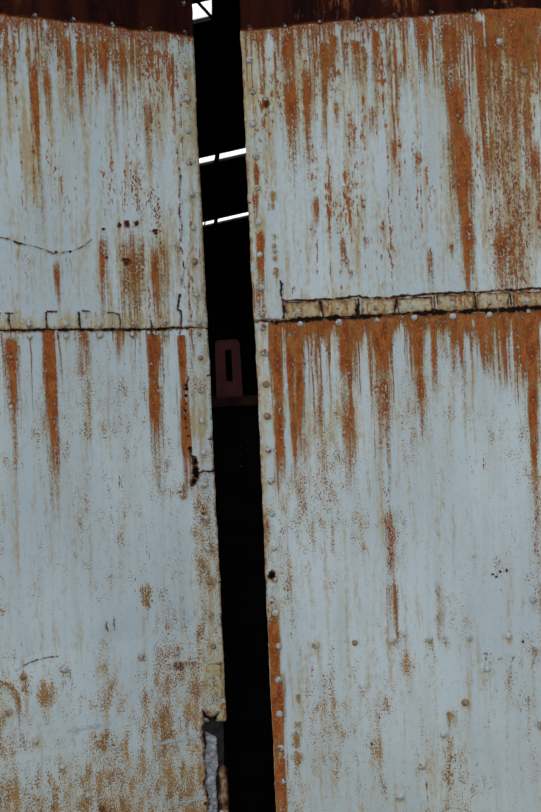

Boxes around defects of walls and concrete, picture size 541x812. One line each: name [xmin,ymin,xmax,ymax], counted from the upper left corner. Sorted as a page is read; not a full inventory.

rust [0,14,193,163]
rust [243,7,541,297]
rust [1,333,20,470]
rust [42,330,62,471]
crack [0,151,194,339]
rust [135,331,165,442]
rust [177,319,195,500]
crack [189,438,215,486]
rust [253,230,541,499]
crack [257,280,541,325]
rust [267,575,302,812]
peeling [204,732,218,812]